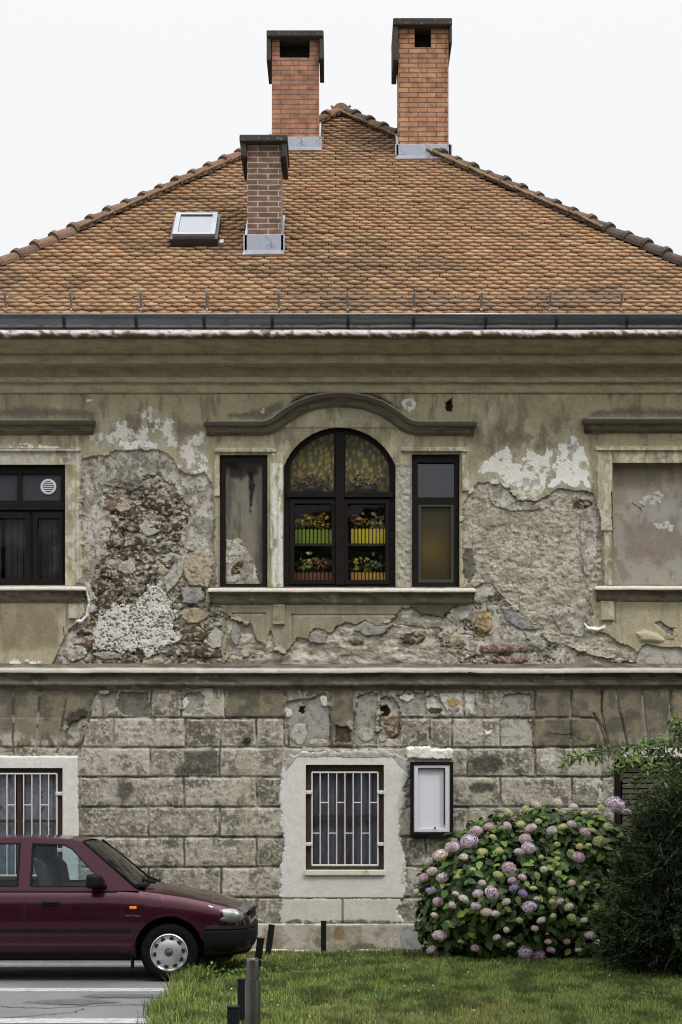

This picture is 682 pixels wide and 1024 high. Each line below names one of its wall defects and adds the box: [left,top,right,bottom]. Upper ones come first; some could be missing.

spalling [9,406,638,664]
spalling [655,621,679,640]
spalling [284,692,476,749]